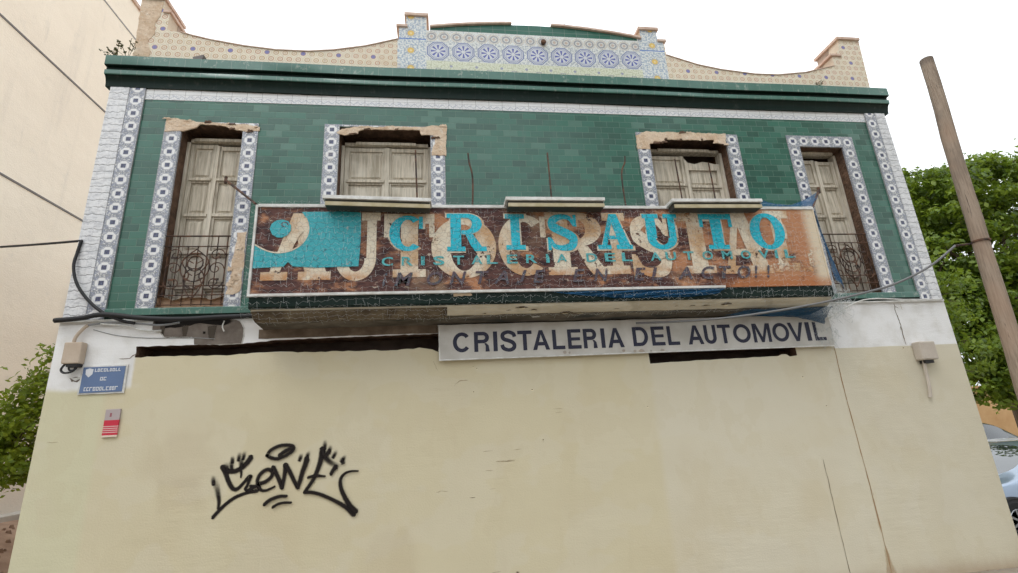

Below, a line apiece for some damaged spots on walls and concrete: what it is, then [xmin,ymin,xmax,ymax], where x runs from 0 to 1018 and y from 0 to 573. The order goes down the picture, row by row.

spalling [162,117,260,133]
spalling [336,124,447,156]
spalling [635,131,729,149]
crack [829,322,892,573]
crack [823,460,850,572]